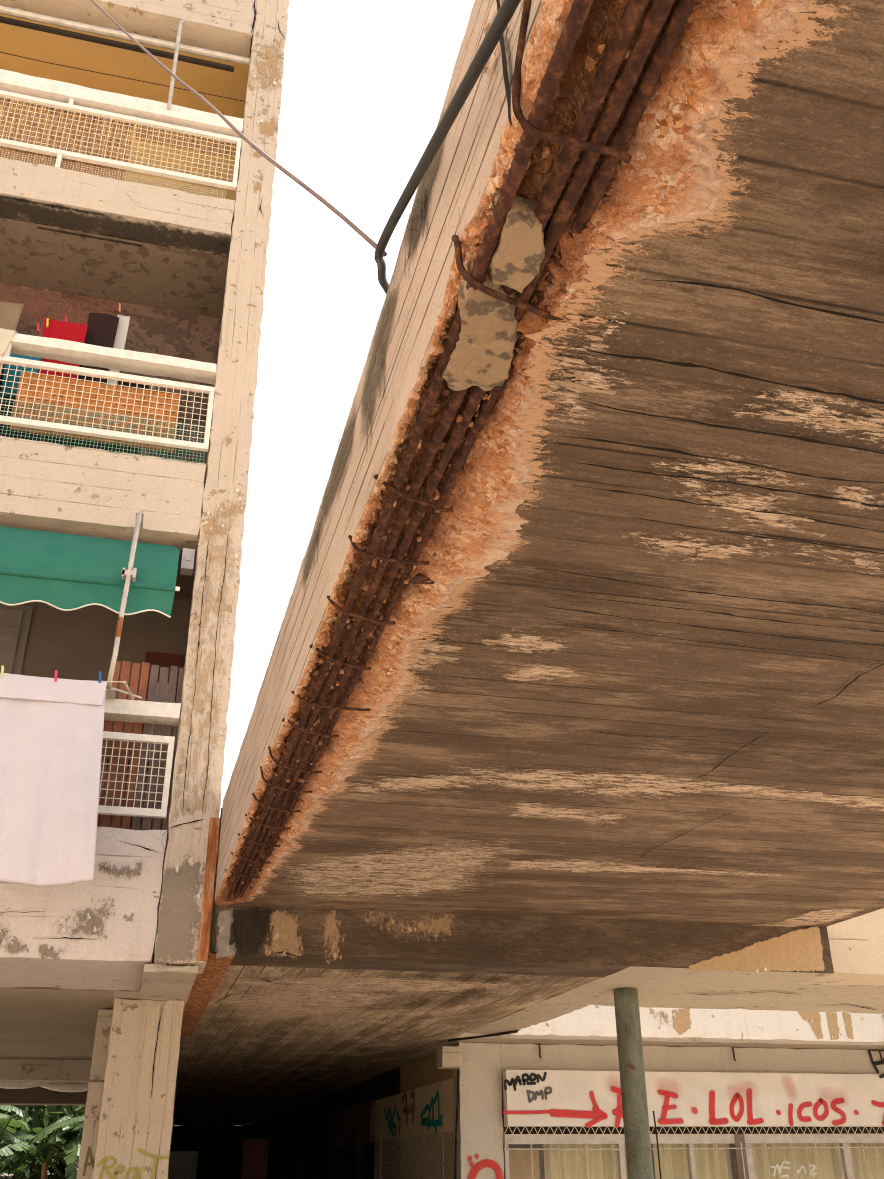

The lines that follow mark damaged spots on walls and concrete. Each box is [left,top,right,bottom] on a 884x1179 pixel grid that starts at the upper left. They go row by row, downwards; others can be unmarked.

water stain [0,195,231,255]
water stain [303,292,396,582]
spalling [154,0,884,1025]
peeling [99,861,149,880]
peeling [0,895,117,960]
peeling [650,1008,690,1035]
peeling [799,1011,854,1040]